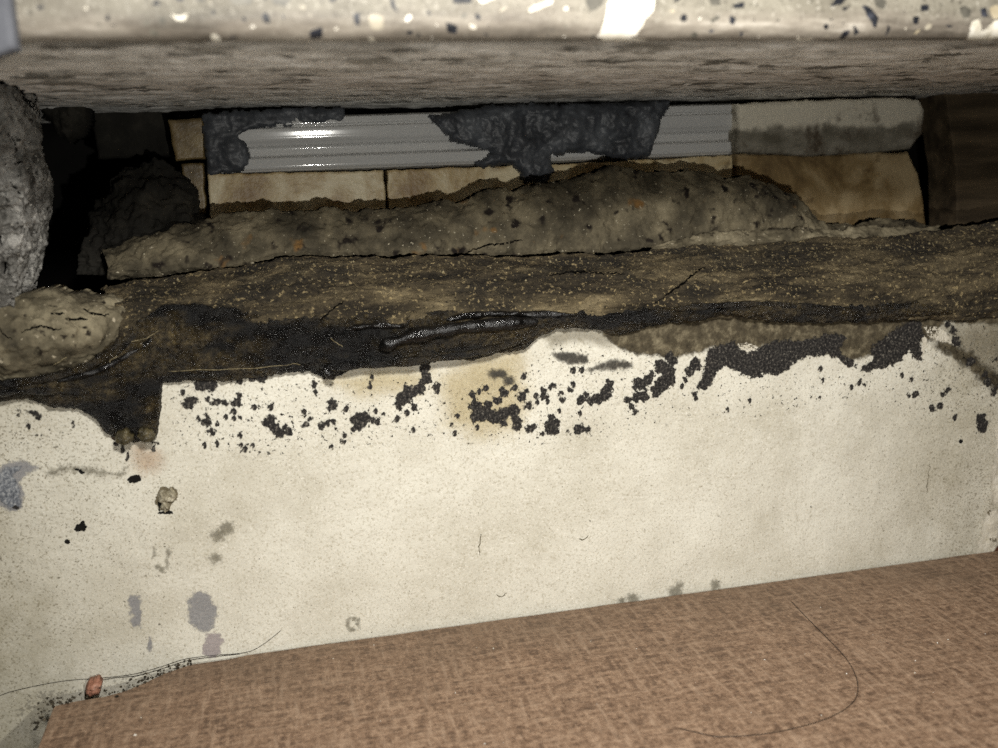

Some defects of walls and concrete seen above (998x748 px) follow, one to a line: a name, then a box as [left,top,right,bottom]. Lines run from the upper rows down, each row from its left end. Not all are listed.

leakage [16,408,50,442]
leakage [171,316,998,455]